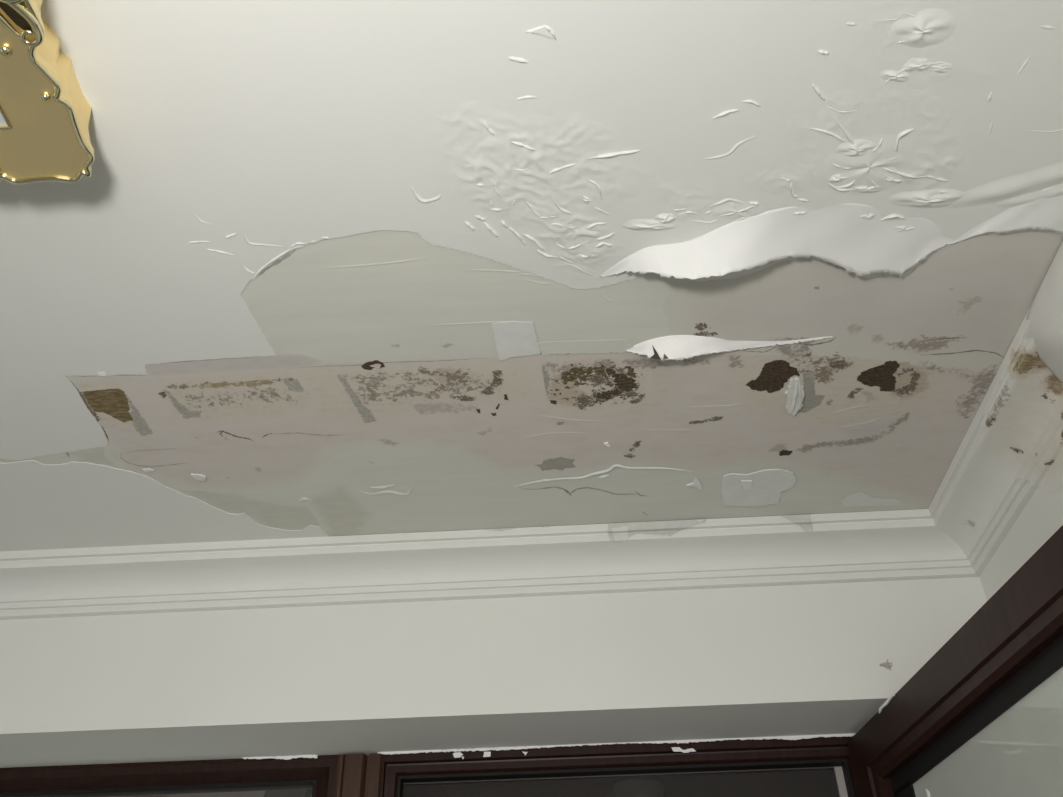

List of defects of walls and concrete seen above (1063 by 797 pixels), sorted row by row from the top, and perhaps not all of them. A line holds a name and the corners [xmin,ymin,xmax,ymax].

leakage [74,380,155,439]
leakage [158,377,311,420]
leakage [337,360,509,436]
flaking render [0,184,1063,542]
leakage [530,353,712,426]
leakage [623,441,642,458]
leakage [689,416,724,424]
leakage [725,322,1063,494]